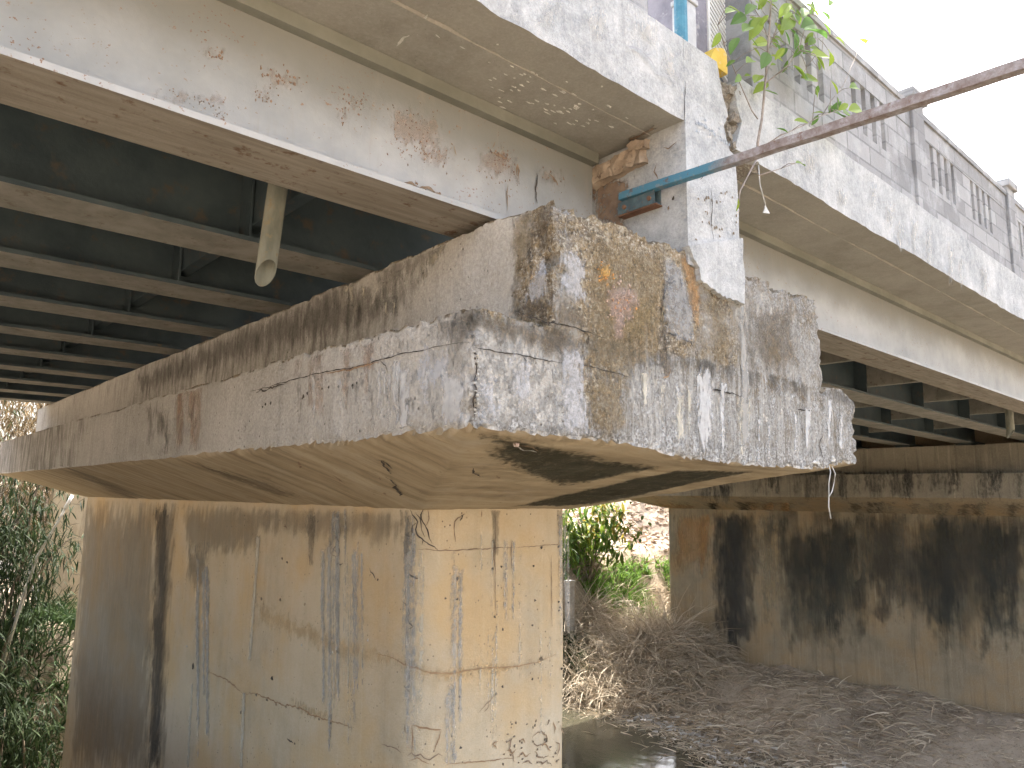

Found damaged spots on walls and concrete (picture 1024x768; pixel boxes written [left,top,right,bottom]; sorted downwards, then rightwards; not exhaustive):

peeling [489,65,614,128]
spalling [592,138,650,191]
crack [253,311,630,419]
crack [213,673,354,728]